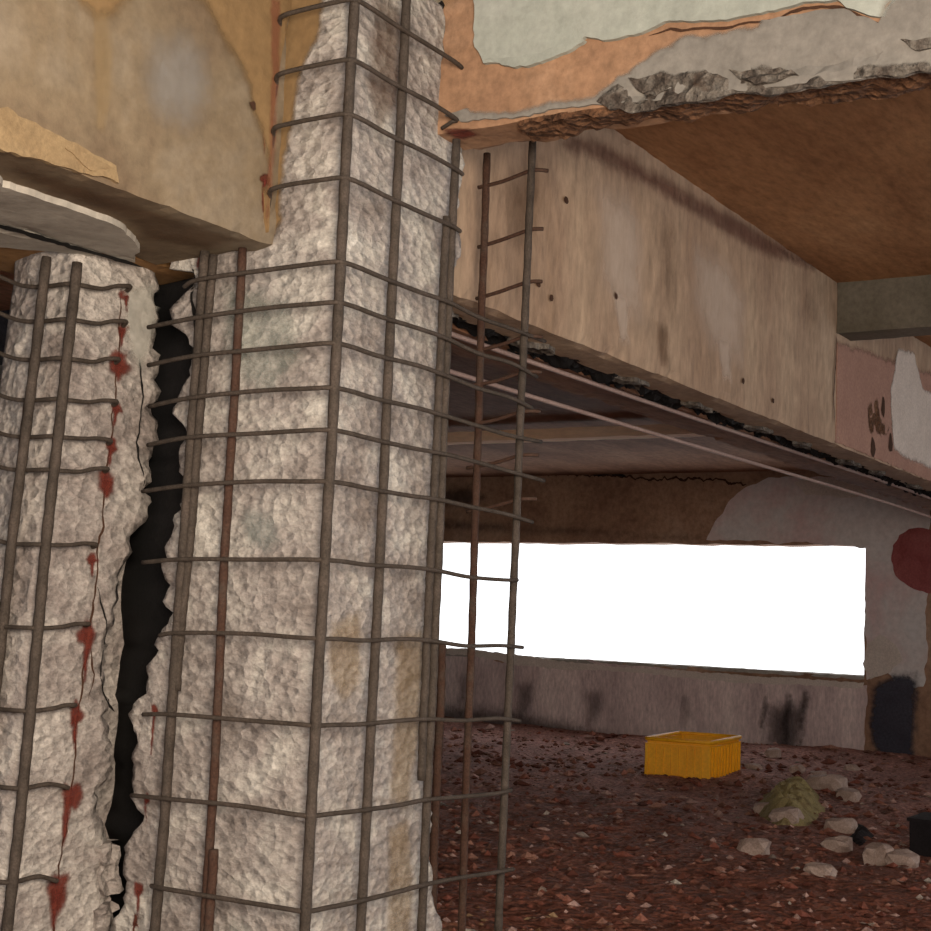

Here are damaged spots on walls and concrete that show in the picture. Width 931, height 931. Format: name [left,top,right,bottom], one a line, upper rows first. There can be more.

crack [0,224,142,267]
corrosion [99,438,117,498]
spalling [299,2,360,931]
spalling [356,0,411,931]
flaking render [417,0,931,931]
spalling [0,176,140,931]
crack [71,265,196,918]
corrosion [71,700,84,748]
water stain [764,699,807,745]
corrosion [62,783,83,842]
crack [58,829,68,877]
corrosion [47,874,68,927]